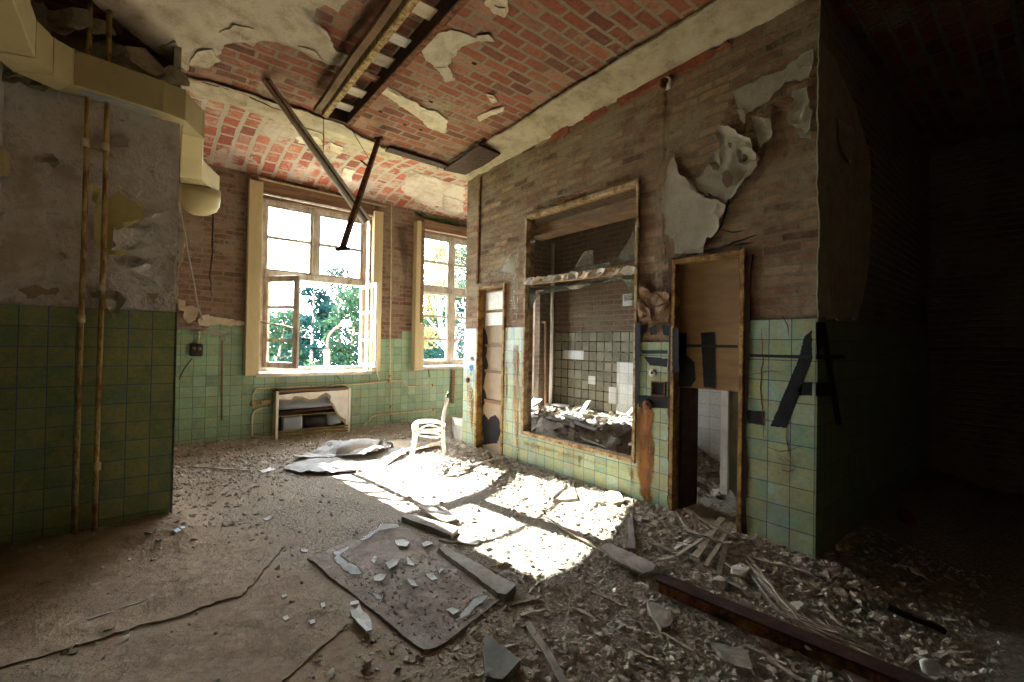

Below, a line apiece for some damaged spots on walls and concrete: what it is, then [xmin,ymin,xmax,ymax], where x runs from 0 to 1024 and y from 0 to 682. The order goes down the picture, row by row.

peeling [484,0,508,18]
peeling [30,0,466,220]
peeling [422,29,495,83]
peeling [477,93,505,122]
spalling [551,126,569,141]
spalling [583,39,732,123]
peeling [661,31,872,321]
peeling [90,290,126,319]
peeling [112,212,245,326]
rust [636,404,655,502]